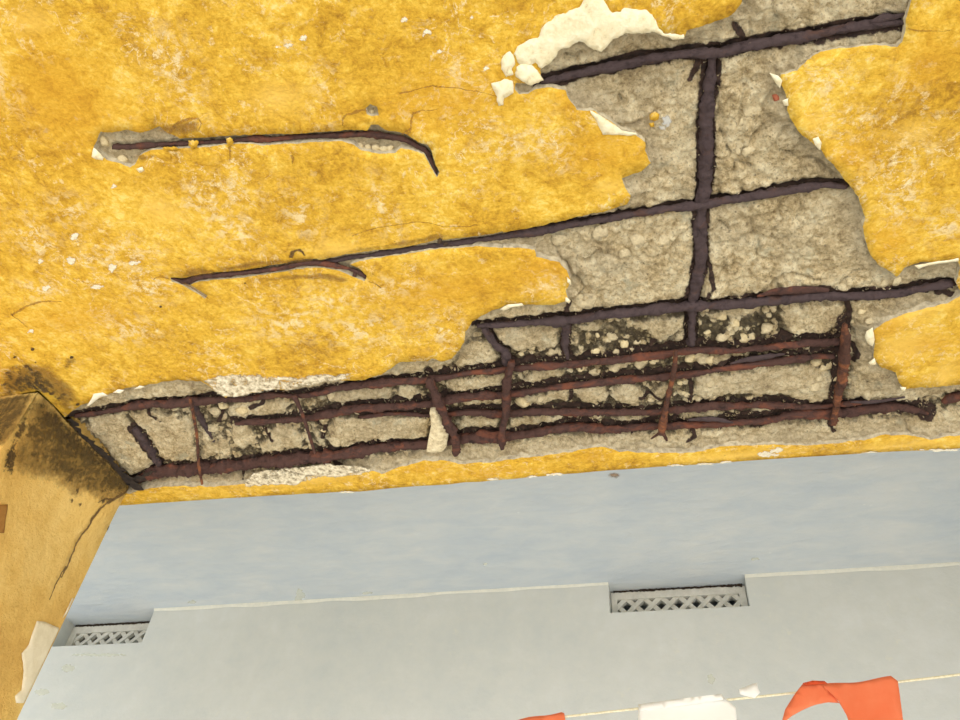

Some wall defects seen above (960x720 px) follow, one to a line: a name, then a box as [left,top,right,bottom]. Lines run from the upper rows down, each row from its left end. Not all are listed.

water stain [0,367,129,506]
crack [49,419,156,600]
corrosion [68,12,957,484]
spalling [67,0,960,484]